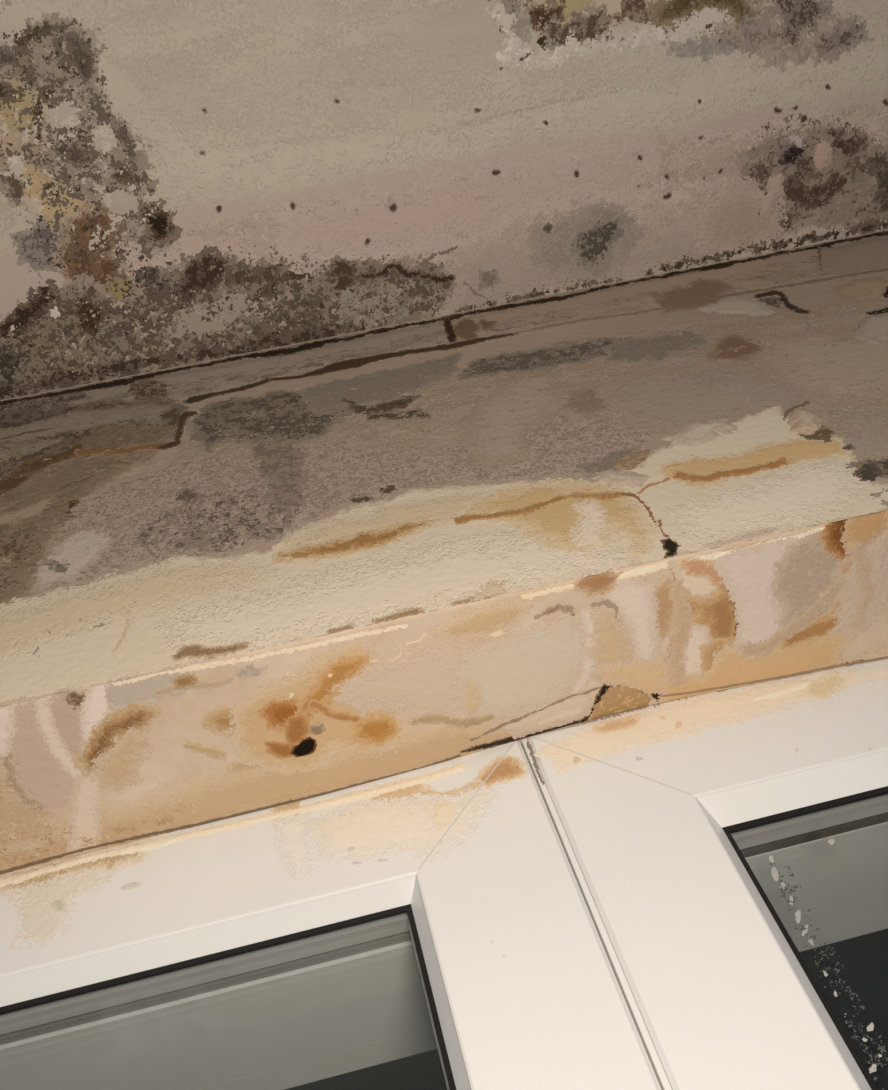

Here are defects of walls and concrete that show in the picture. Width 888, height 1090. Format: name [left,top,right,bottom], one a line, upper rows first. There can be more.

leakage [483,0,888,76]
leakage [0,12,888,663]
crack [0,230,888,450]
peeling [0,478,557,706]
rust [258,651,402,760]
rust [271,517,435,564]
leakage [0,522,888,954]
crack [0,656,888,875]
flaking render [502,685,652,740]
crack [621,477,671,538]
rust [654,556,738,676]
peeling [508,405,888,600]